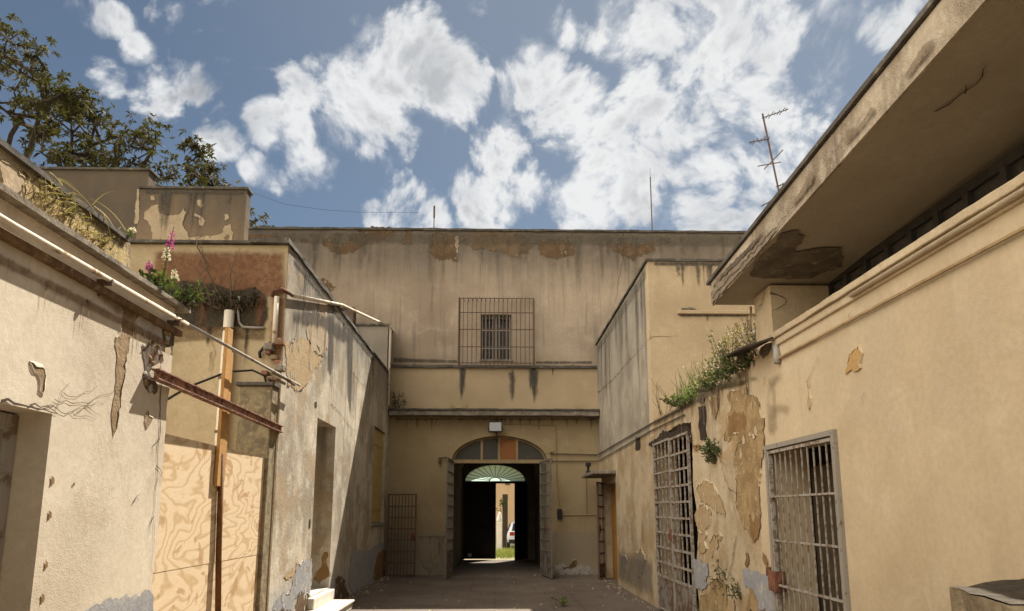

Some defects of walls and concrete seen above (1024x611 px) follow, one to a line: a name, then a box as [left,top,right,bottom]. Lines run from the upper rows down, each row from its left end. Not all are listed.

crack [935,66,986,112]
peeling [134,189,233,240]
damp [655,262,721,282]
spalling [750,231,844,280]
peeling [29,361,46,397]
crack [1,384,131,417]
peeling [112,308,175,438]
peeling [261,309,329,391]
peeling [845,344,864,374]
peeling [635,387,774,611]
peeling [85,589,154,611]
peeling [273,552,349,611]